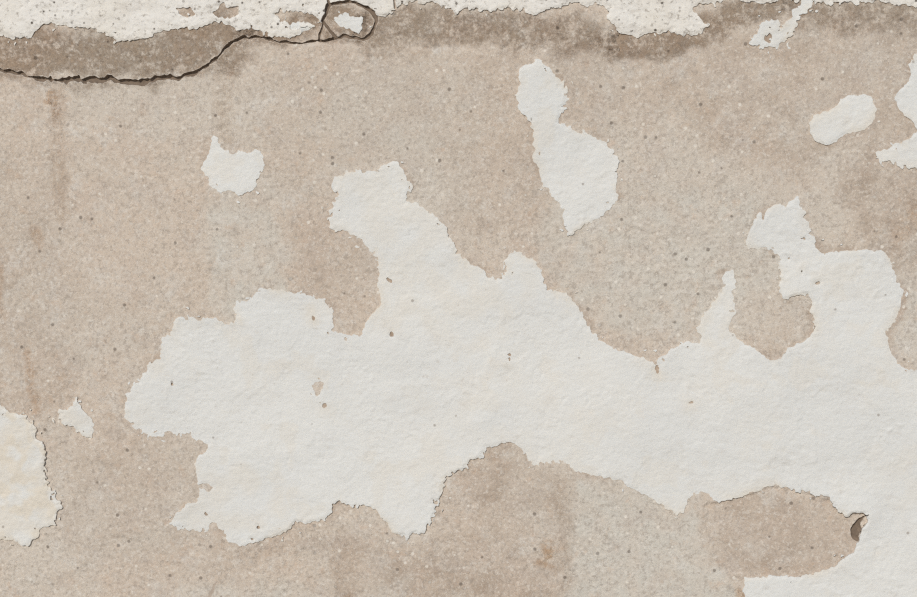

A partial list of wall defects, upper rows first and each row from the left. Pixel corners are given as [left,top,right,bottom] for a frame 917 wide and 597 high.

peeling [0,22,196,80]
crack [0,0,396,86]
peeling [170,25,263,72]
peeling [275,8,333,43]
peeling [324,1,375,38]
peeling [749,0,813,49]
peeling [201,136,265,196]
peeling [515,59,620,236]
peeling [808,94,877,145]
peeling [894,54,917,129]
peeling [0,404,63,547]
peeling [704,484,868,578]